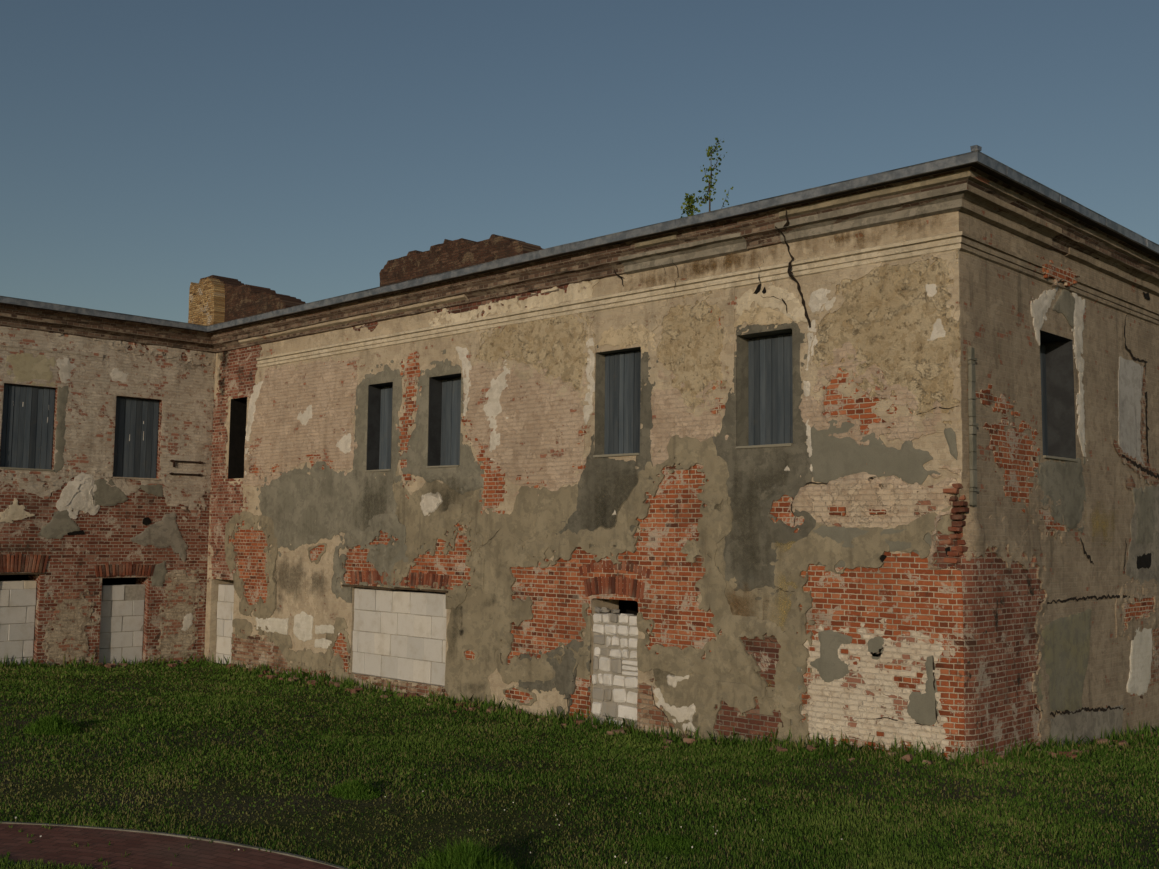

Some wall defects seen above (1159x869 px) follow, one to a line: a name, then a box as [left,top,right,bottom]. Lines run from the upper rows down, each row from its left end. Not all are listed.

flaking render [0,326,449,697]
flaking render [308,248,1069,760]
crack [758,211,811,338]
flaking render [1030,256,1088,461]